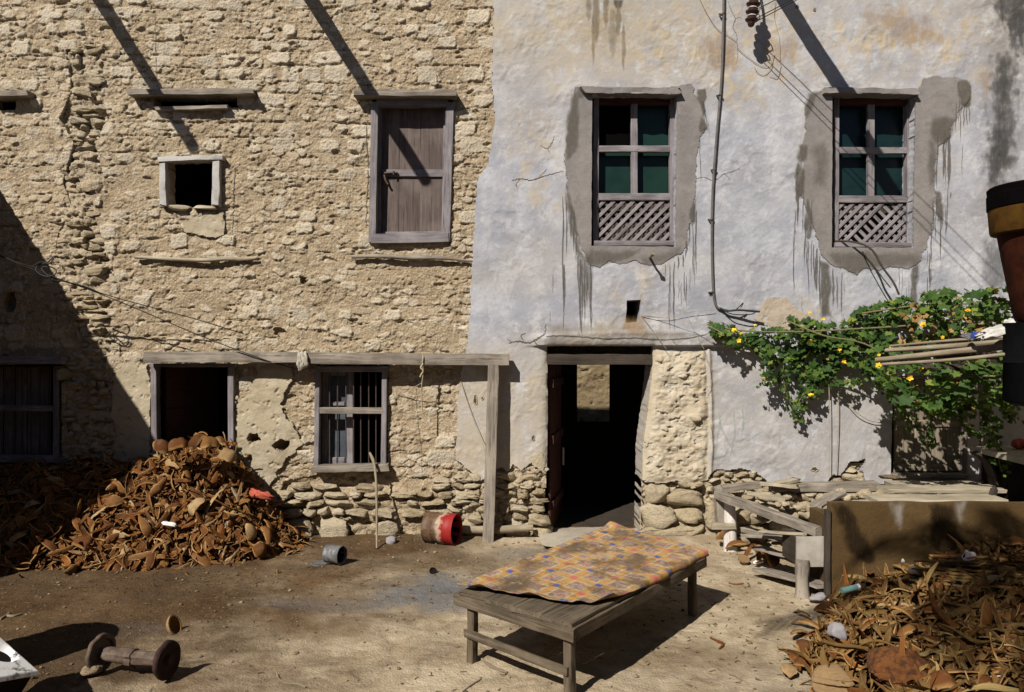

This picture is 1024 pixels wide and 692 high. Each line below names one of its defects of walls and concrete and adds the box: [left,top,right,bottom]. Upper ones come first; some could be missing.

leakage [587,0,625,56]
leakage [994,0,1024,48]
crack [515,137,554,187]
leakage [562,197,632,332]
leakage [793,145,842,316]
leakage [899,80,971,303]
leakage [989,59,1015,183]
flaking render [234,364,304,504]
spalling [443,435,553,537]